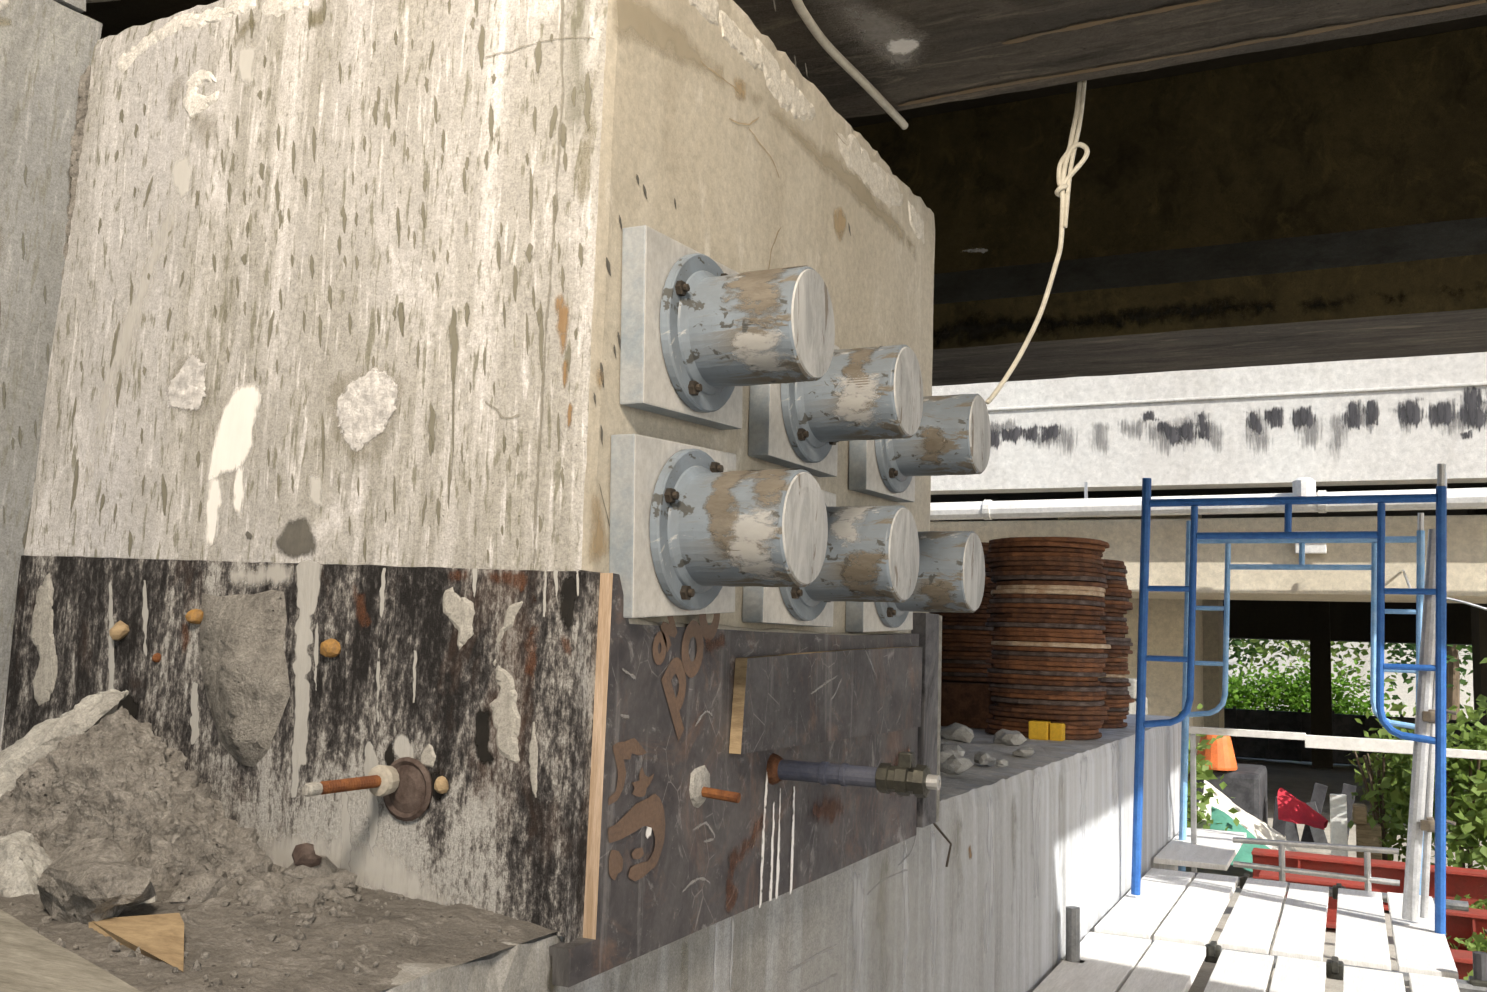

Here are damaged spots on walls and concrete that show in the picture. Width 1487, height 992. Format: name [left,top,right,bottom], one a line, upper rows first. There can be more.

peeling [115,0,314,73]
peeling [838,133,925,244]
damp [933,297,1274,348]
spalling [167,354,207,411]
peeling [30,572,58,705]
damp [190,682,200,745]
damp [231,518,323,798]
damp [376,568,386,722]
peeling [443,587,475,649]
peeling [489,601,538,798]
damp [543,570,558,617]
damp [272,734,443,902]